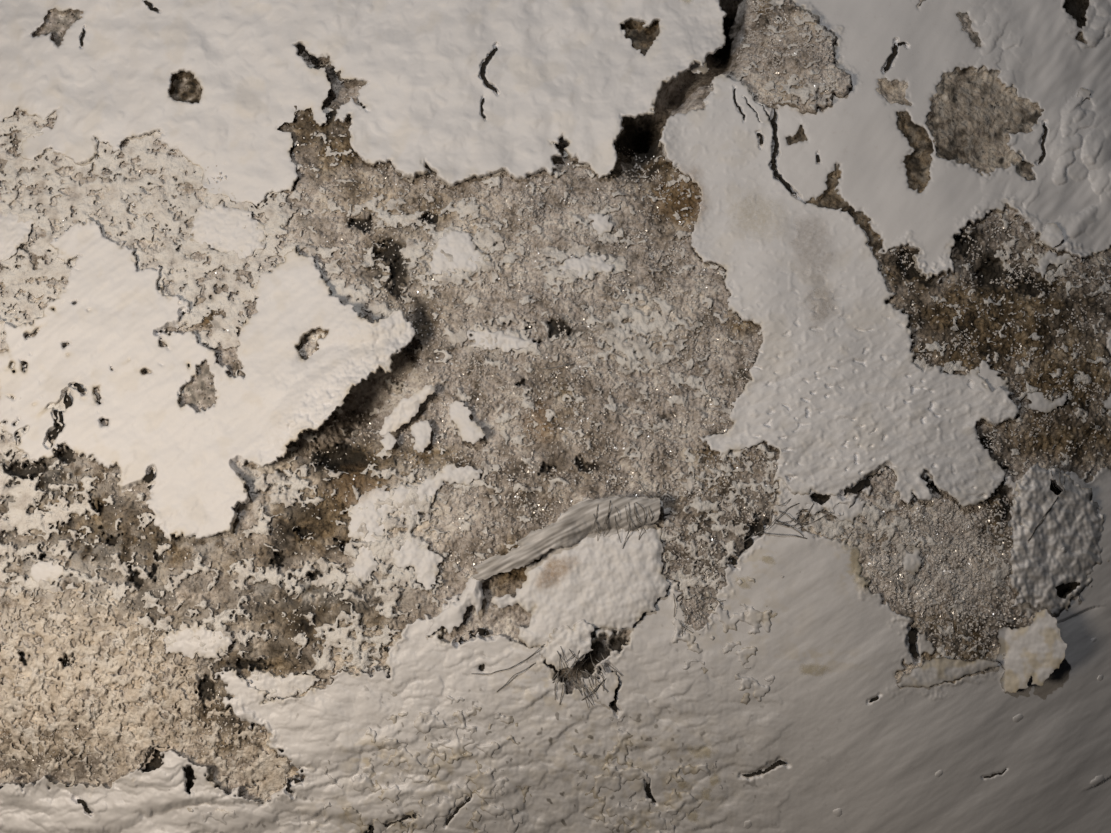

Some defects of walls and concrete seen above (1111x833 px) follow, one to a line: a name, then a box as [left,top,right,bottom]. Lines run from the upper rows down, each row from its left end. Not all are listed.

flaking render [0,0,780,804]
peeling [659,0,1111,693]
peeling [323,695,532,833]
peeling [576,716,717,833]